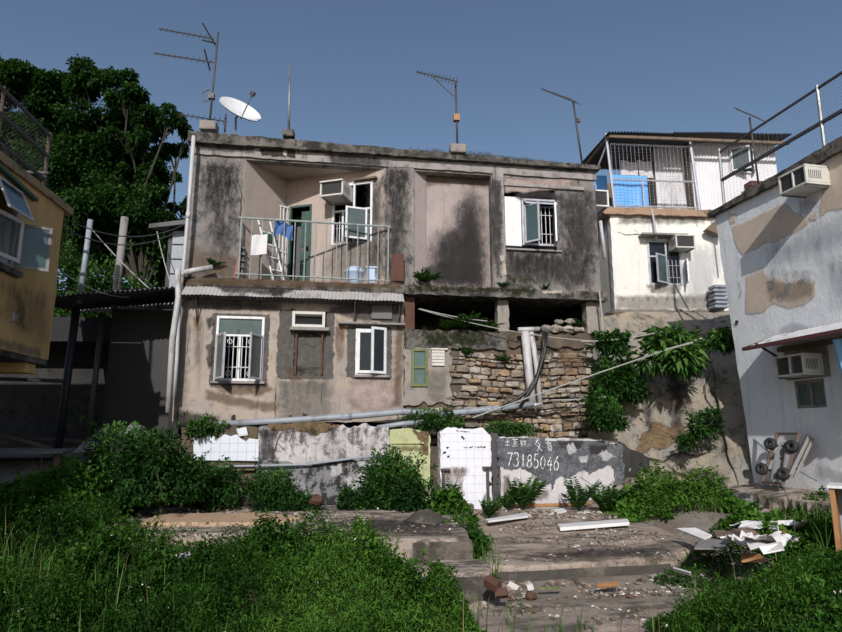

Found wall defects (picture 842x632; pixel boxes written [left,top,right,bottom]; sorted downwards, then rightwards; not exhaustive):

leakage [199,166,238,251]
peeling [729,153,842,254]
leakage [428,180,599,285]
peeling [746,269,816,314]
spalling [268,413,339,436]
peeling [330,459,376,491]
peeling [567,442,588,463]
crack [645,450,712,476]